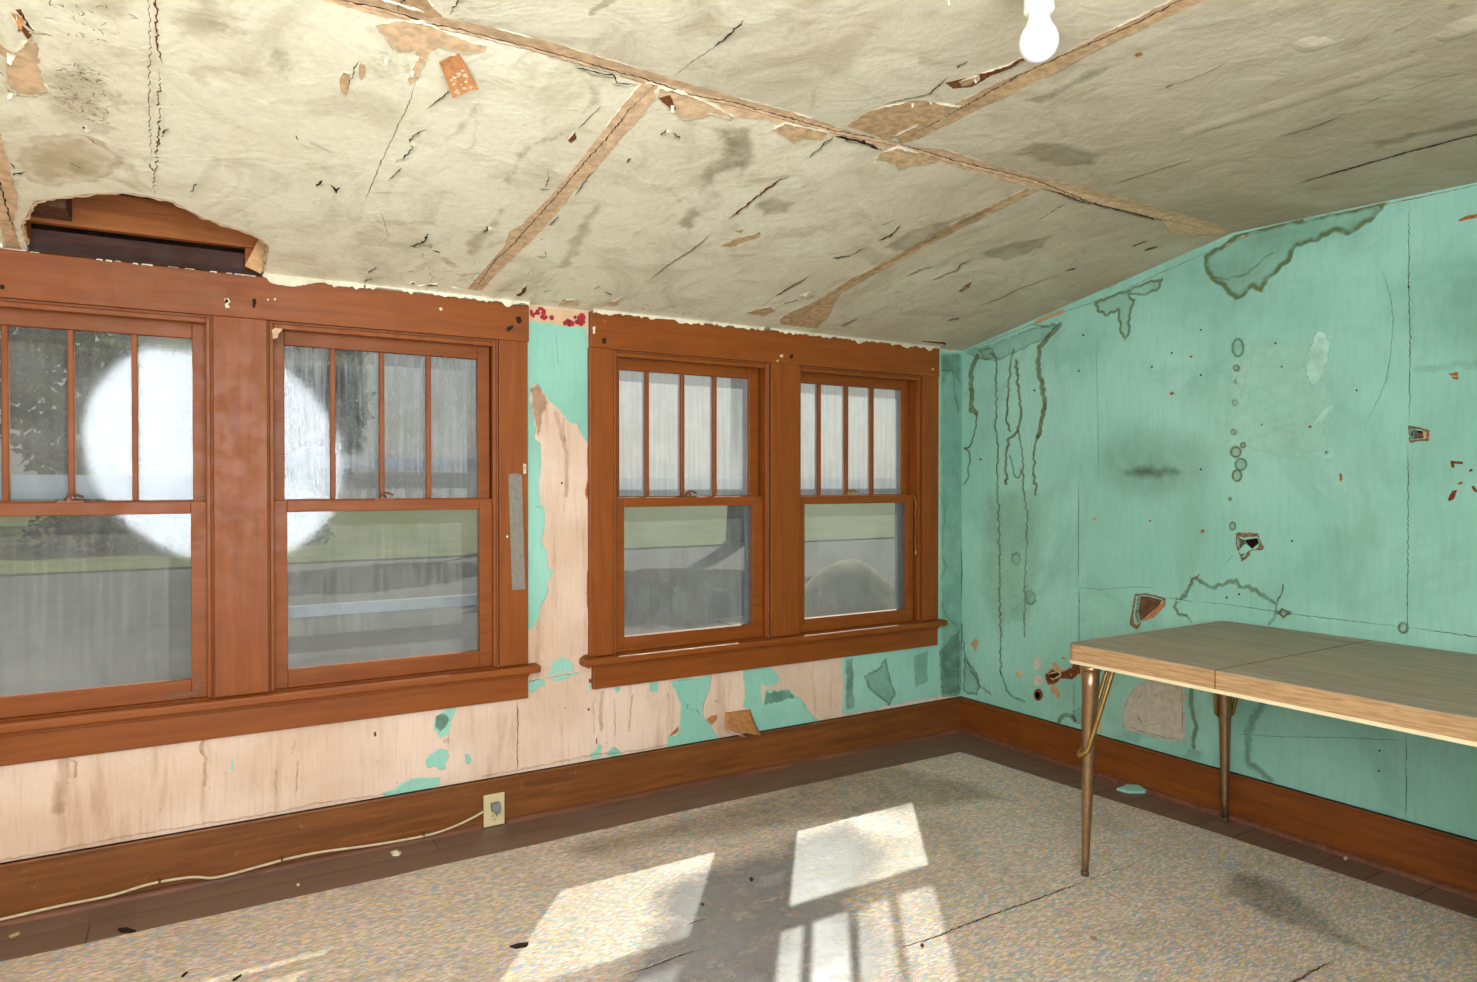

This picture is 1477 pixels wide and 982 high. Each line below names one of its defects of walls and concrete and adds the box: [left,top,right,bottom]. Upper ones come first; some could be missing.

peeling [0,7,51,99]
crack [42,0,198,195]
peeling [548,46,1026,172]
spalling [0,211,244,253]
water stain [1204,202,1385,299]
peeling [523,385,541,478]
water stain [957,328,1057,674]
hole [1236,532,1264,562]
spalling [1130,593,1166,629]
peeling [528,654,592,693]
peeling [649,675,718,746]
spalling [1036,657,1082,698]